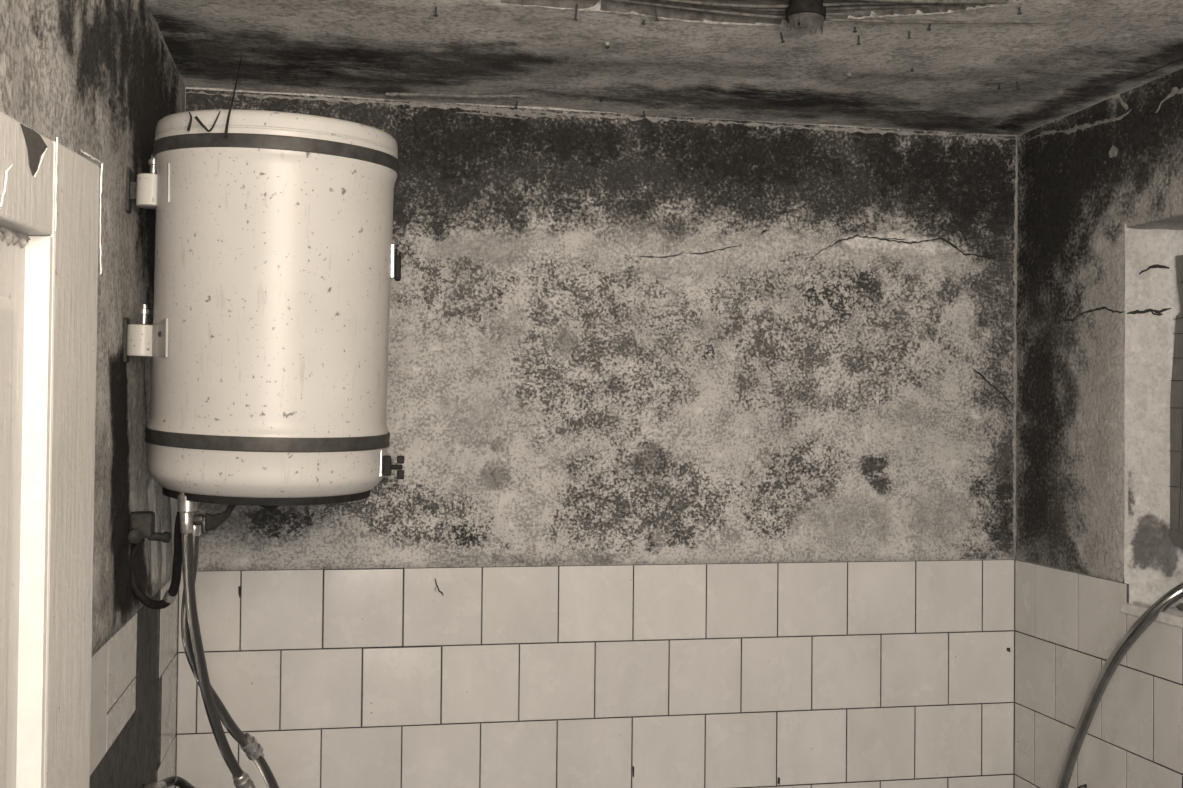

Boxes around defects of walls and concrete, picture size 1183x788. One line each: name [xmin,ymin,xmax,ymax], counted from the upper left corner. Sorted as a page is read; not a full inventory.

crack [639,230,768,258]
crack [1139,264,1170,275]
leakage [33,0,1183,577]
crack [1060,306,1171,321]